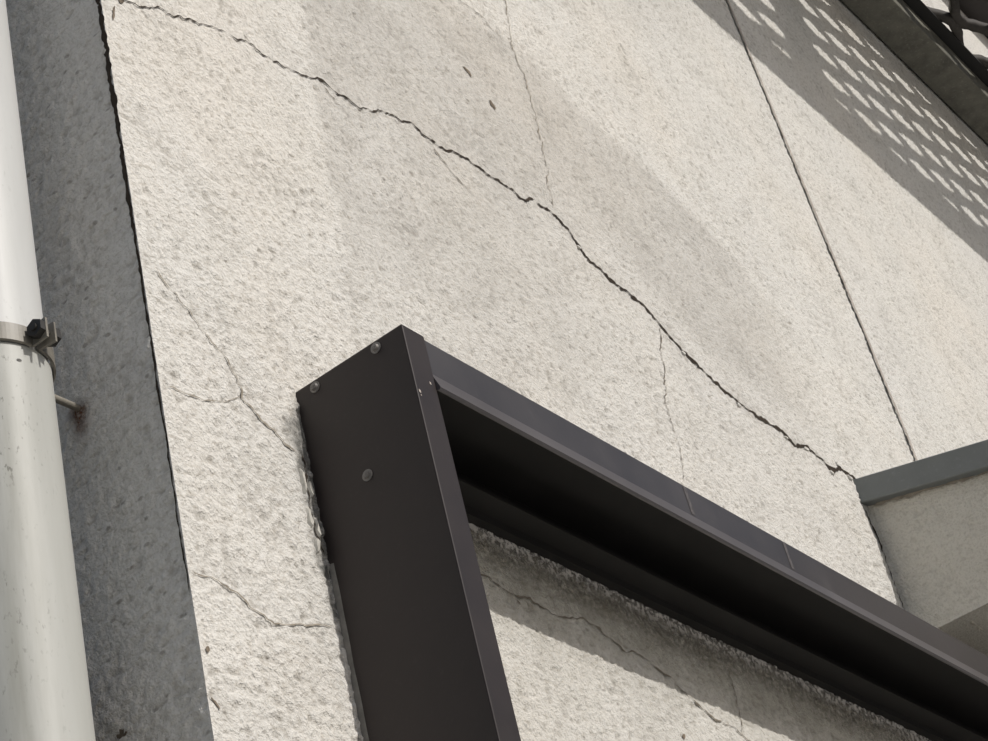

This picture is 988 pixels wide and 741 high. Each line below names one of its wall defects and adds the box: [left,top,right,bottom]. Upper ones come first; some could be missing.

crack [95,0,856,627]
crack [863,507,905,610]
crack [481,574,750,741]